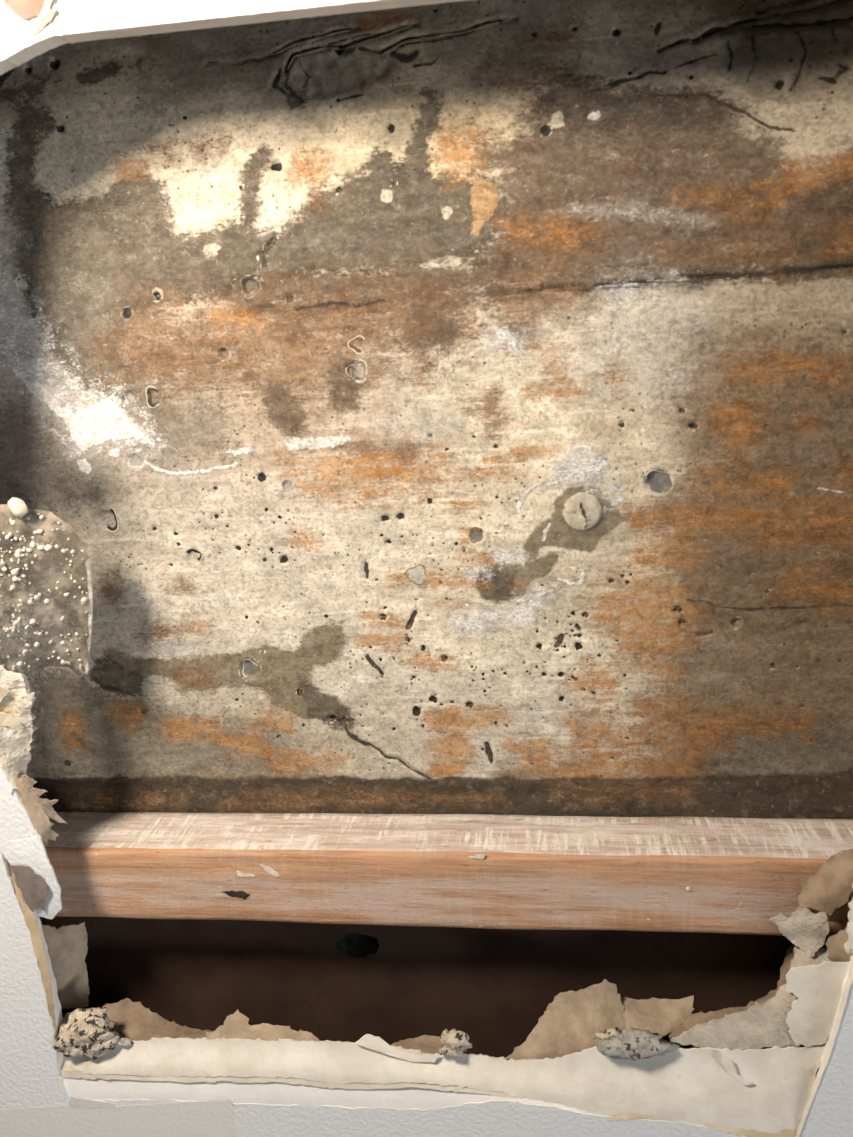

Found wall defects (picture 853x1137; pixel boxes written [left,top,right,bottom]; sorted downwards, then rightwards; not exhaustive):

water stain [77,59,142,86]
crack [210,21,500,98]
crack [589,0,853,132]
water stain [0,74,853,517]
corrosion [388,528,497,606]
water stain [439,441,625,640]
corrosion [139,620,206,645]
corrosion [357,613,458,672]
corrosion [507,459,853,786]
crack [322,715,431,780]
water stain [33,620,853,819]
corrosion [423,705,514,779]